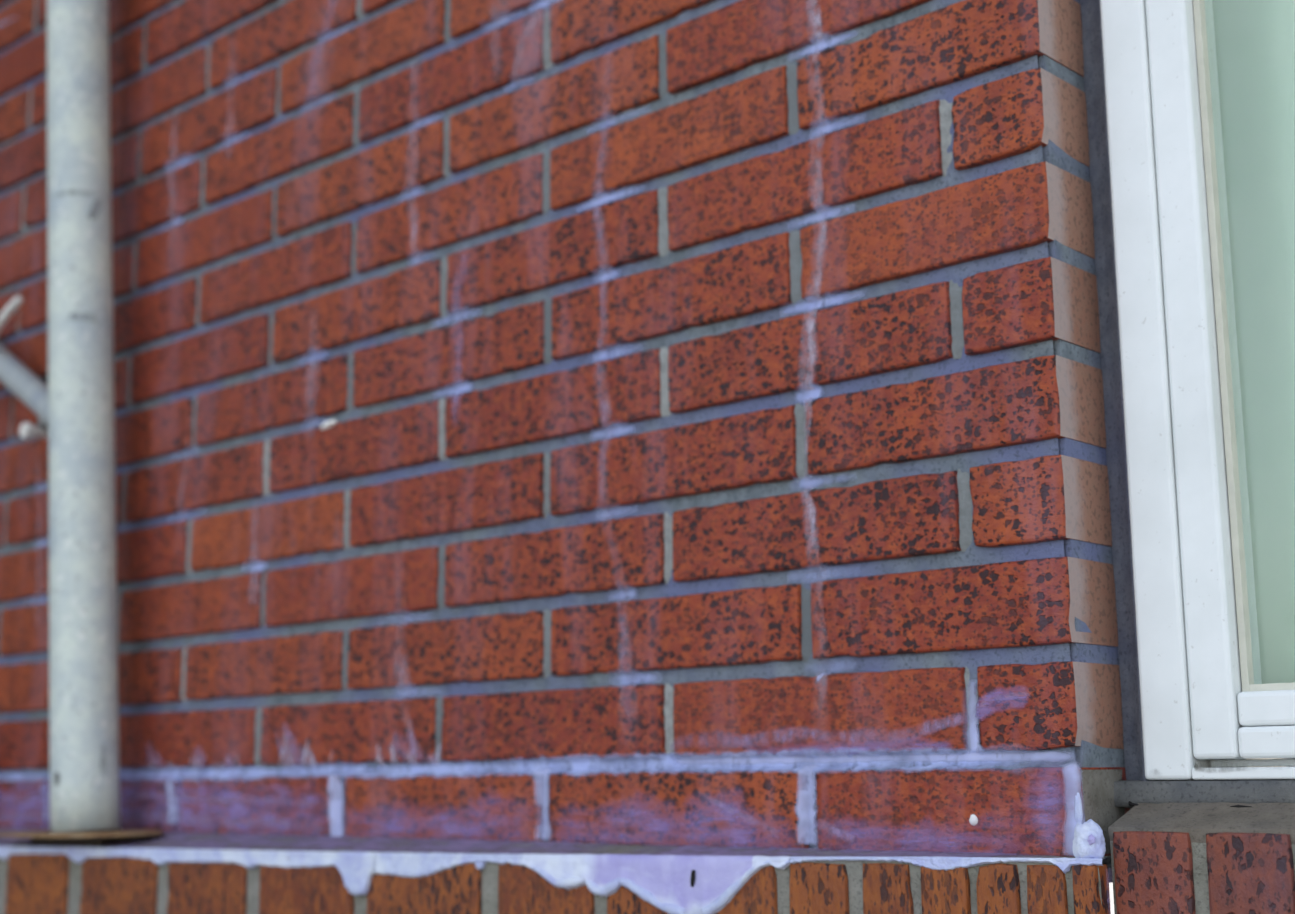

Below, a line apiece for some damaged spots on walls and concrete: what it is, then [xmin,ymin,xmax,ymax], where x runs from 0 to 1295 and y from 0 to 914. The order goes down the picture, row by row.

leakage [804,12,844,54]
leakage [817,123,836,136]
leakage [584,191,632,208]
leakage [805,210,839,222]
leakage [600,270,617,281]
leakage [787,295,849,333]
leakage [595,350,621,360]
leakage [797,385,821,403]
leakage [596,425,631,436]
leakage [620,674,653,684]
leakage [0,692,1106,914]